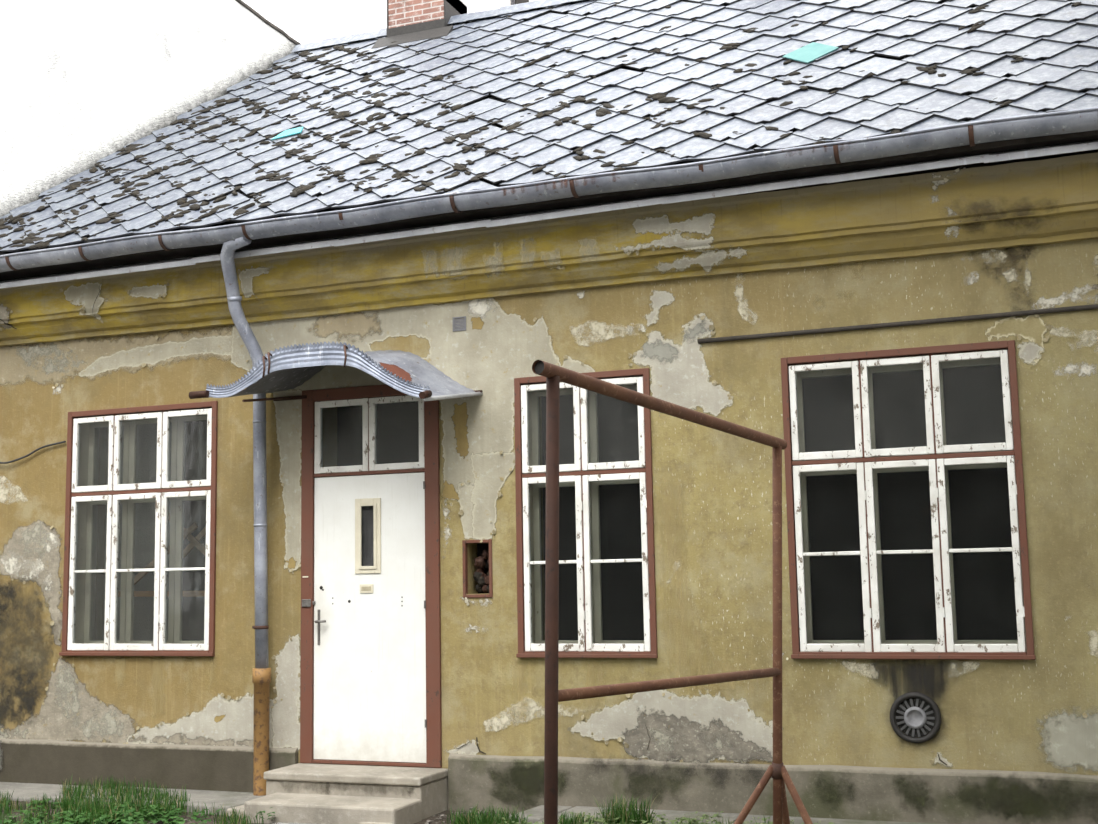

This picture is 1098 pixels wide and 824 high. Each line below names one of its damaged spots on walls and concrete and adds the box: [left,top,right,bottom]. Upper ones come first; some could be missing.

peeling [616,213,747,273]
water stain [986,245,1033,296]
water stain [1033,284,1098,310]
flaking render [627,290,733,416]
flaking render [0,298,595,574]
water stain [0,586,49,724]
flaking render [0,520,254,747]
spalling [269,634,301,750]
spalling [567,690,783,764]
water stain [489,764,544,809]
water stain [895,777,928,813]
water stain [956,776,1098,821]